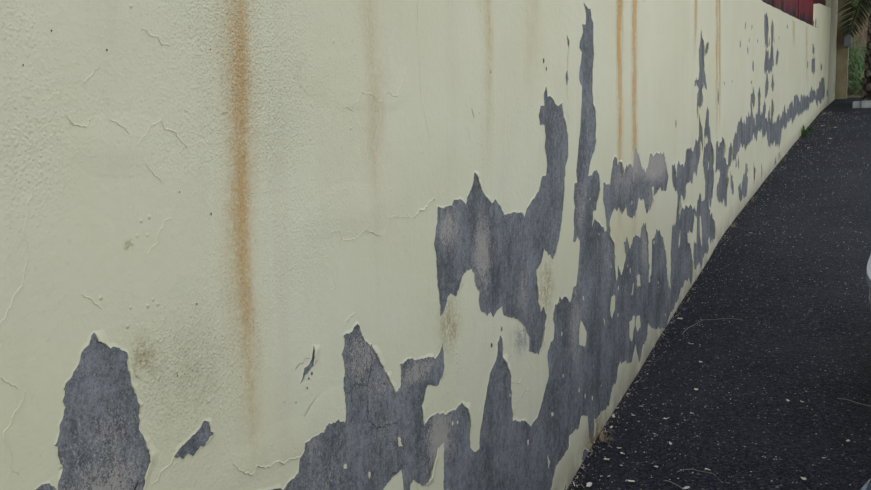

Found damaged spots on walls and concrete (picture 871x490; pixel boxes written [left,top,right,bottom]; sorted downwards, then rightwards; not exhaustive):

crack [67,116,188,183]
peeling [257,2,835,490]
peeling [34,330,159,490]
peeling [173,417,216,461]